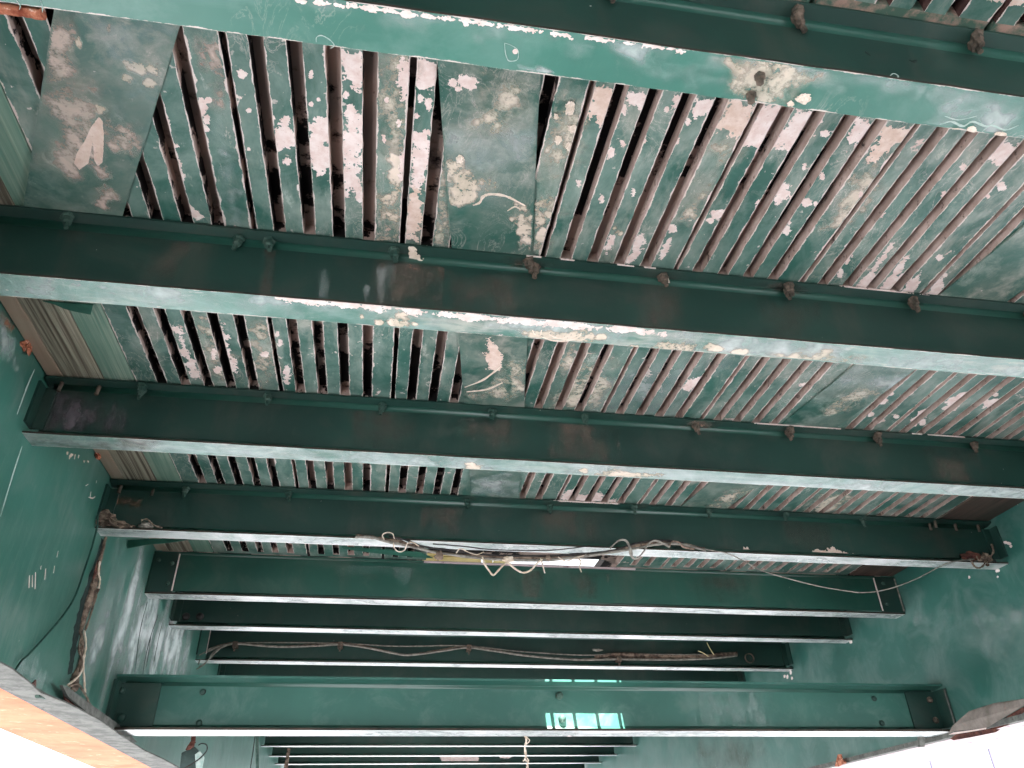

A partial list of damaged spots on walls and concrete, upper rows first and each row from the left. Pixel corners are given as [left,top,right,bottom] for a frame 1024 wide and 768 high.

peeling [295,0,686,54]
peeling [273,115,295,166]
peeling [308,97,330,177]
peeling [341,49,362,203]
peeling [384,56,437,243]
peeling [588,85,613,128]
peeling [685,98,714,126]
peeling [716,99,830,151]
peeling [846,117,911,164]
peeling [834,242,948,295]
peeling [275,297,667,337]
peeling [210,319,239,374]